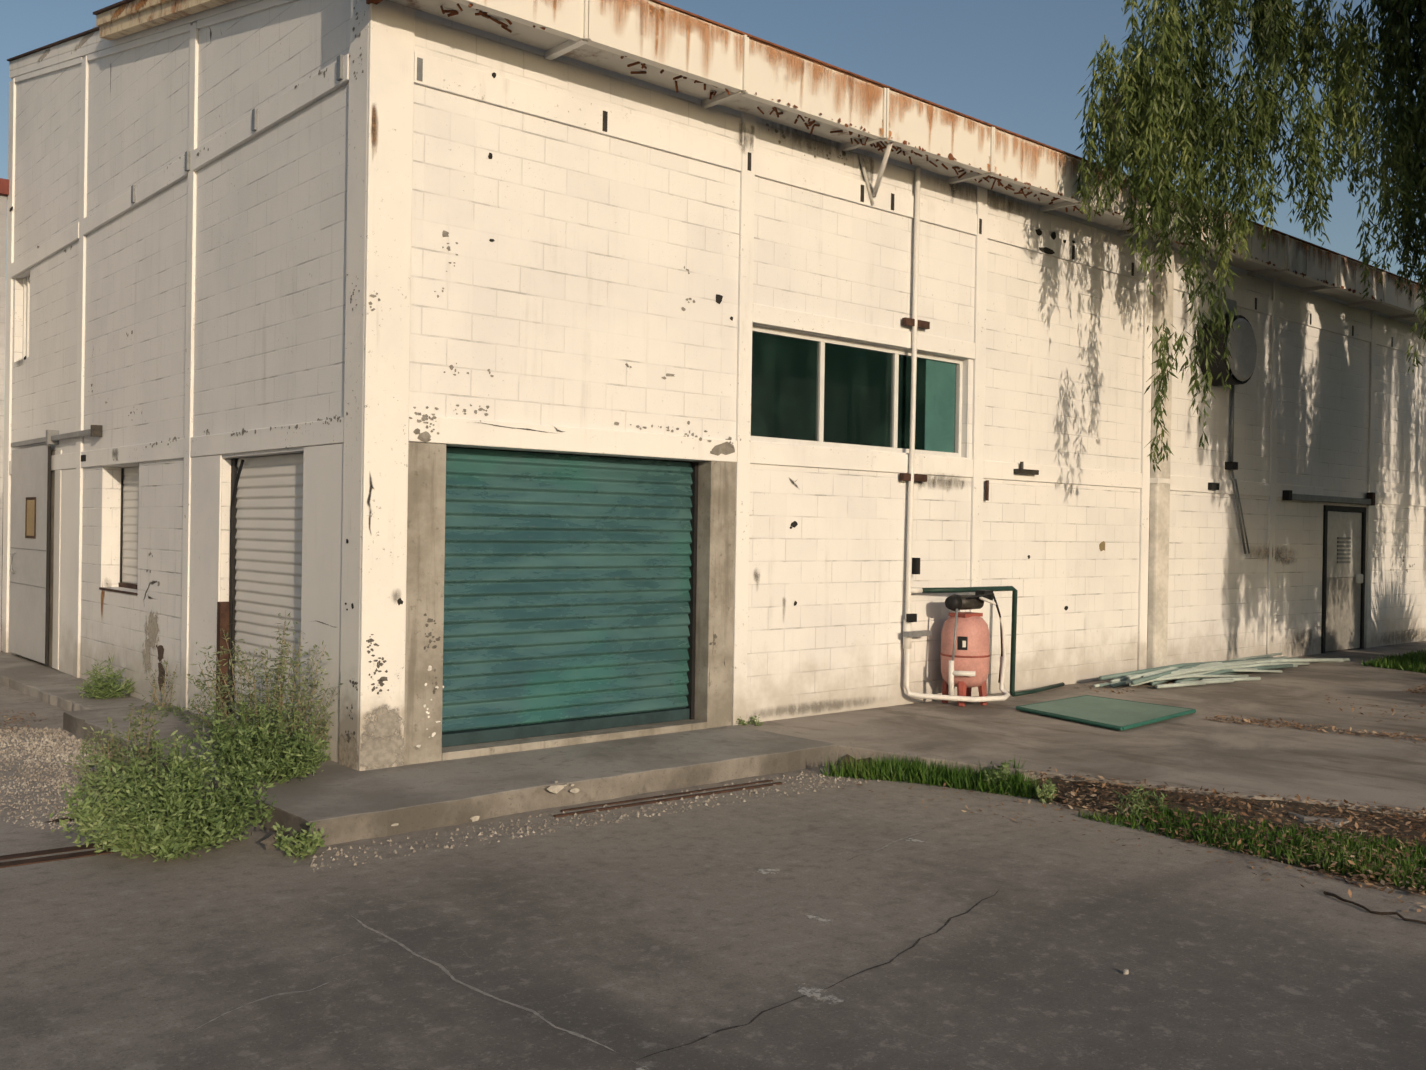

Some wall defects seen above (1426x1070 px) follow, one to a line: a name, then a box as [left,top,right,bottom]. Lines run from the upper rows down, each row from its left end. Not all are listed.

rust [602,0,1149,218]
peeling [409,404,489,443]
spalling [614,421,741,456]
peeling [424,613,441,650]
peeling [143,641,169,687]
peeling [338,634,444,770]
crack [175,891,998,1067]